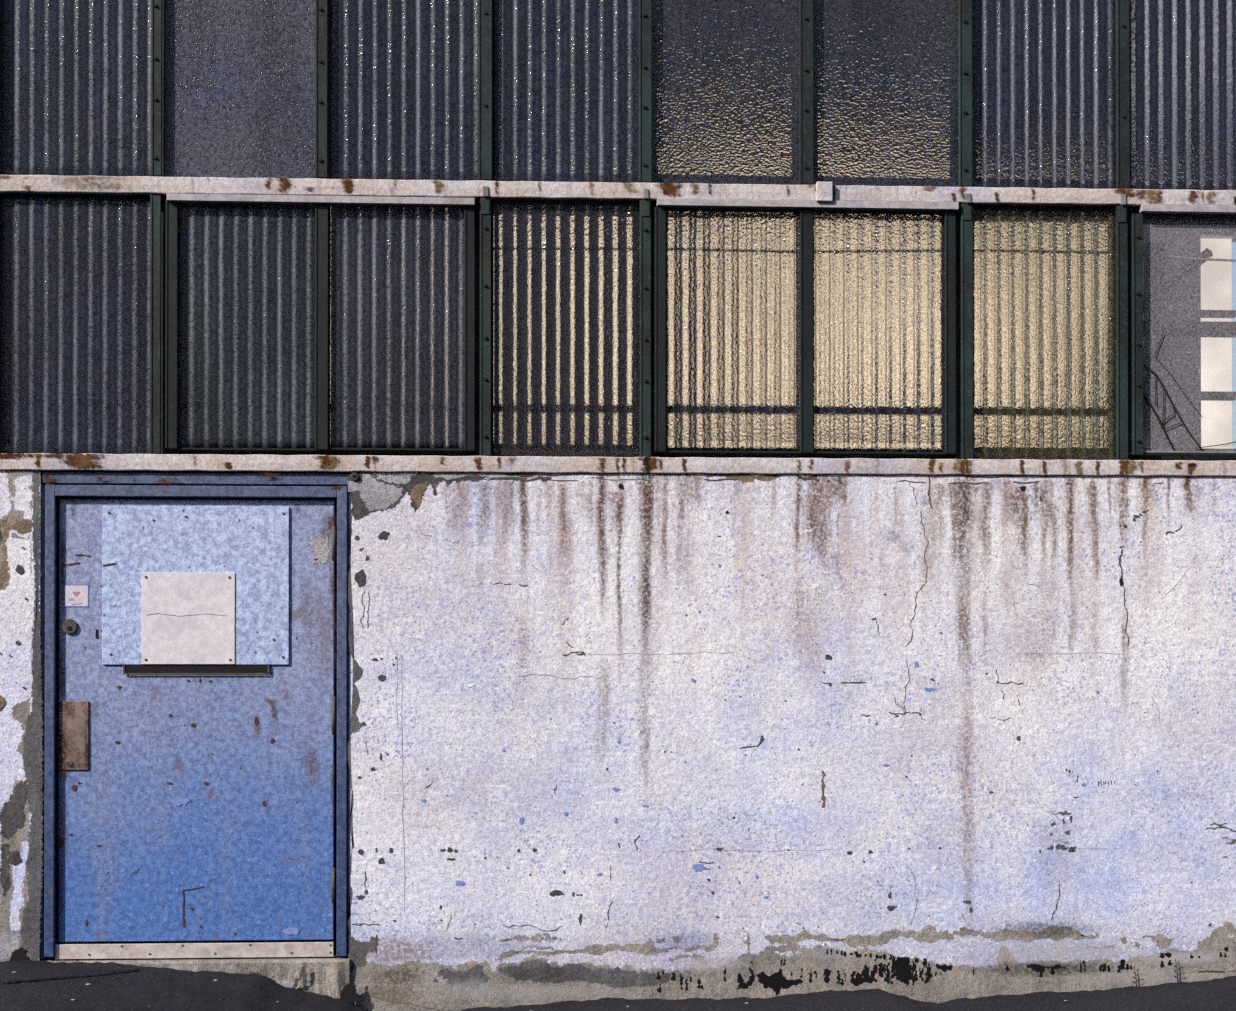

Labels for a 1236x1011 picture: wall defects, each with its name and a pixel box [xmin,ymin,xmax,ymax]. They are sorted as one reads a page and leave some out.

corrosion [659,182,711,196]
corrosion [0,453,104,484]
corrosion [597,457,666,587]
corrosion [1053,460,1147,565]
corrosion [1175,462,1196,502]
crack [369,472,1109,720]
crack [1020,520,1182,654]
peeling [0,470,44,962]
peeling [339,471,1236,1011]
water stain [657,970,703,993]
water stain [751,949,941,997]
water stain [1082,959,1132,972]